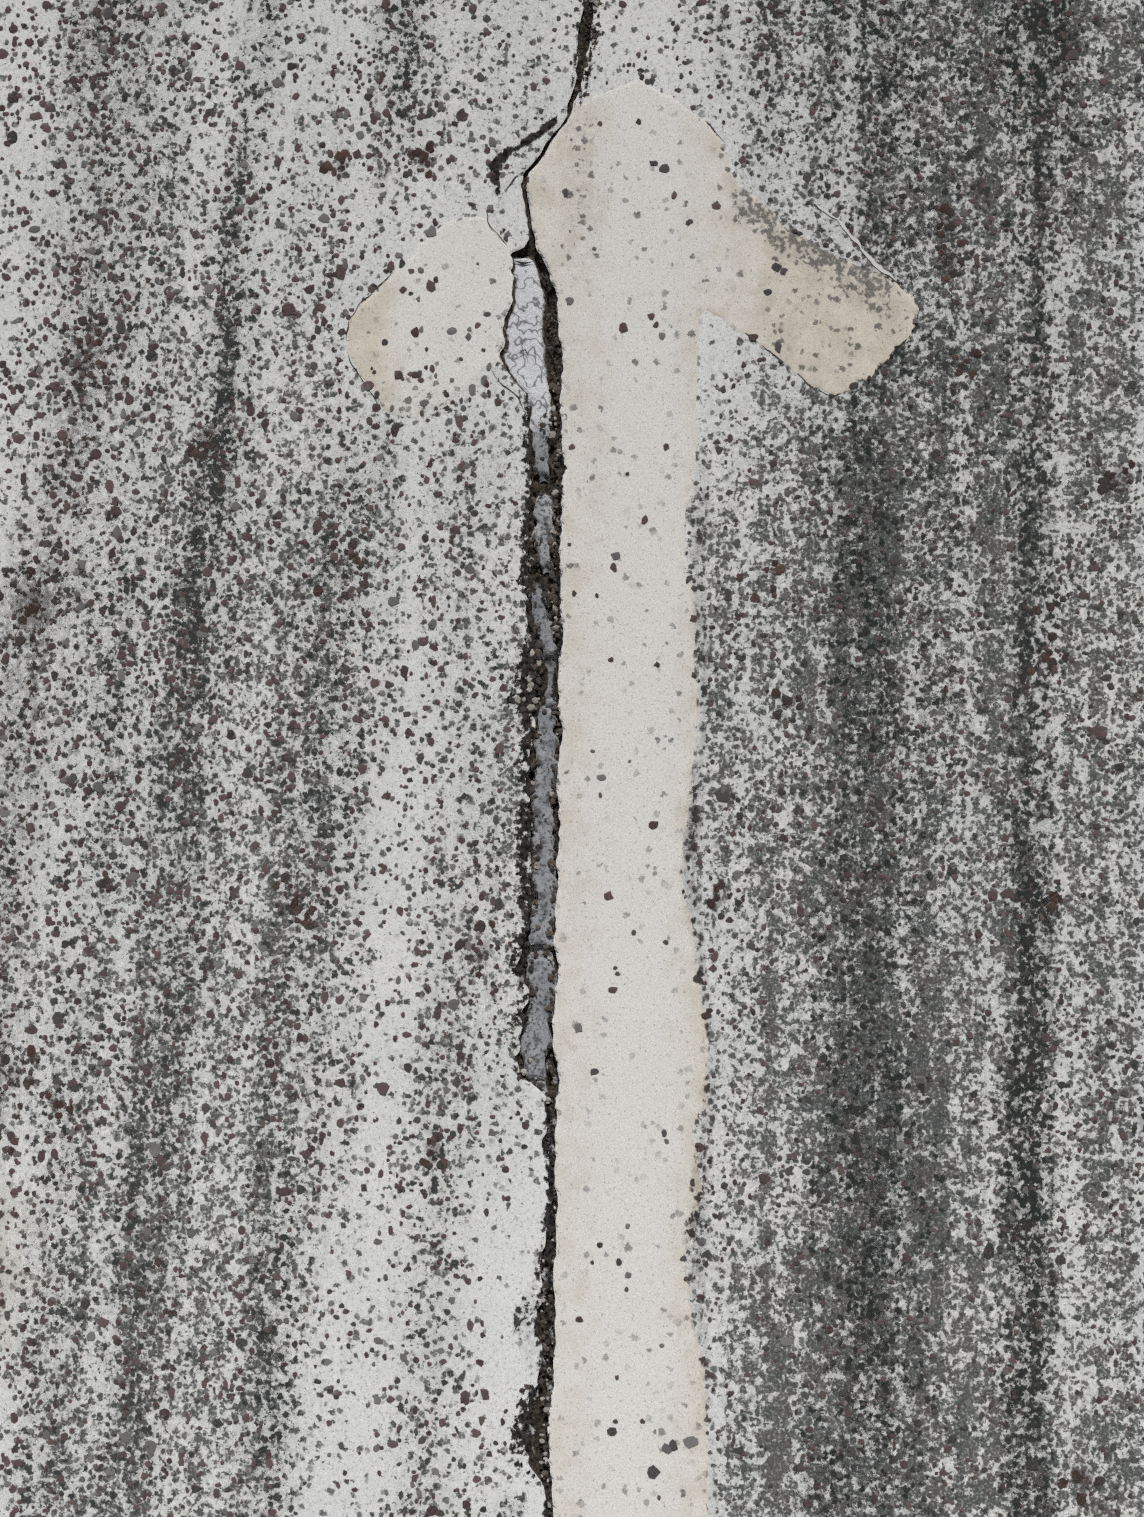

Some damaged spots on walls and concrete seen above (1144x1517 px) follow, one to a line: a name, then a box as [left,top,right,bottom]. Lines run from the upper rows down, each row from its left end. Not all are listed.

crack [486,0,600,1517]